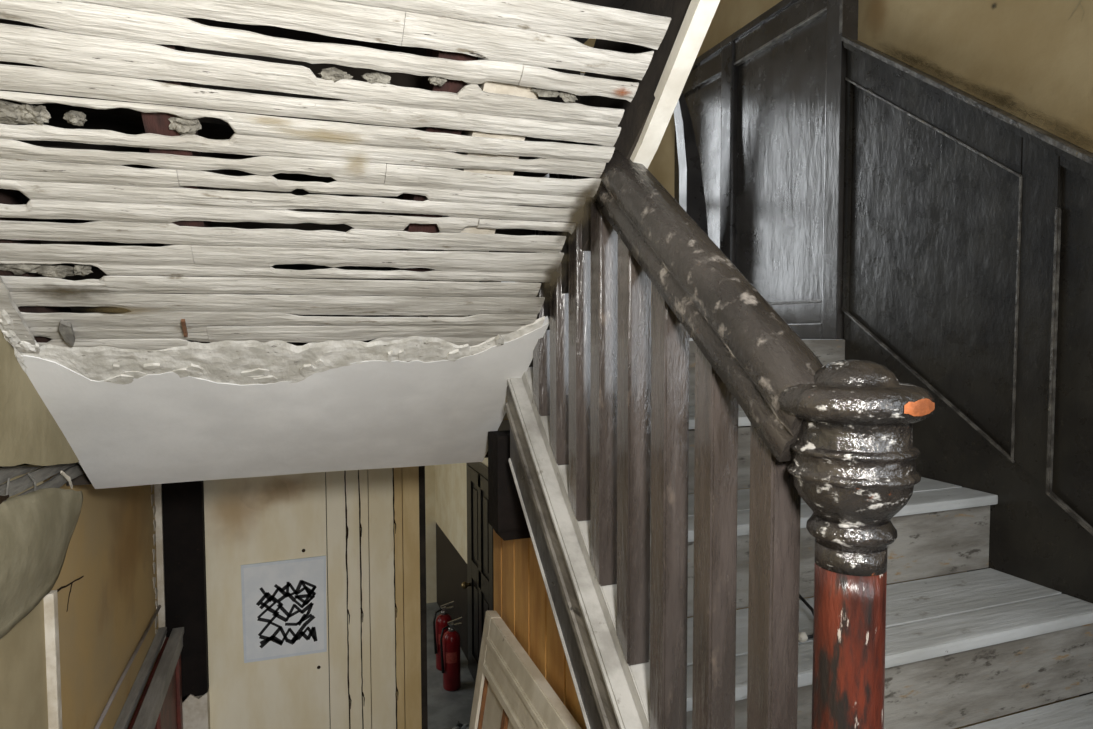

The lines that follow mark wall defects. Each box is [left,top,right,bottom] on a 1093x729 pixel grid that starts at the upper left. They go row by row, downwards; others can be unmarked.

spalling [0,310,545,385]